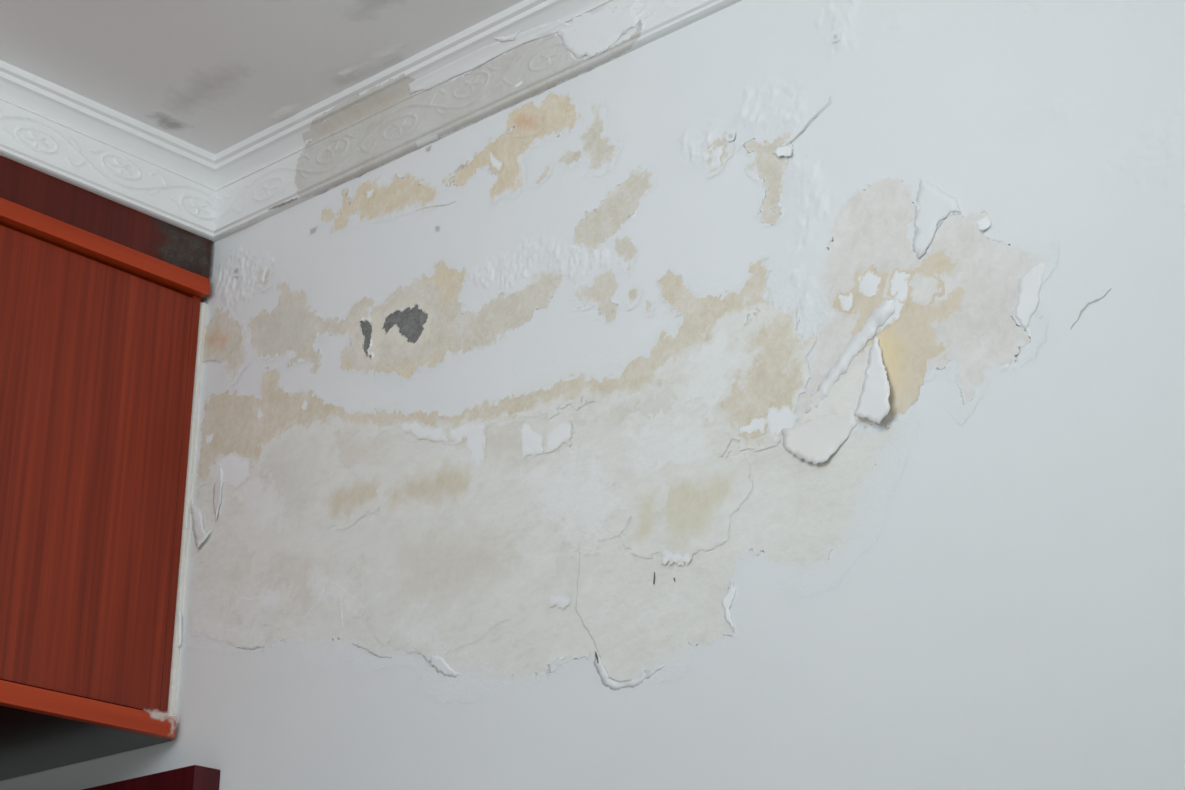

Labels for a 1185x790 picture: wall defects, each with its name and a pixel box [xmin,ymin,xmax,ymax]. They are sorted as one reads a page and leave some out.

peeling [182,5,1060,705]
crack [1070,289,1111,329]